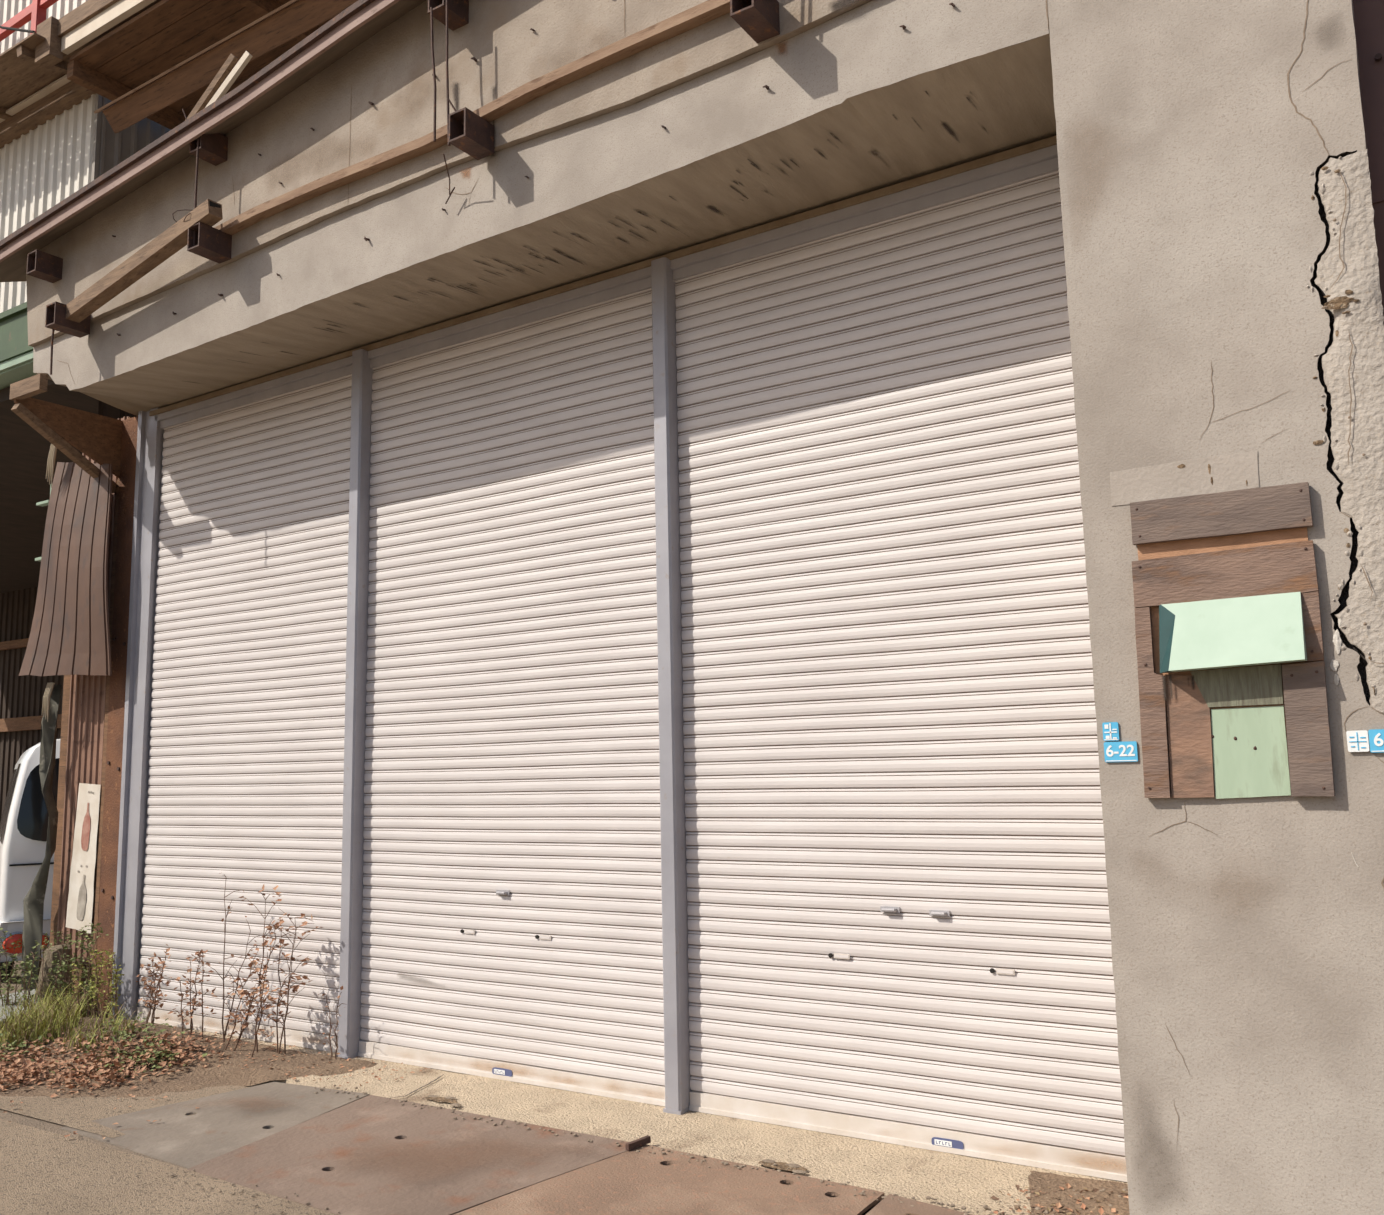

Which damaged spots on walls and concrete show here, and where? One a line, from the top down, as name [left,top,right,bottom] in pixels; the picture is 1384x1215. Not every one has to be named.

crack [1200,0,1383,731]